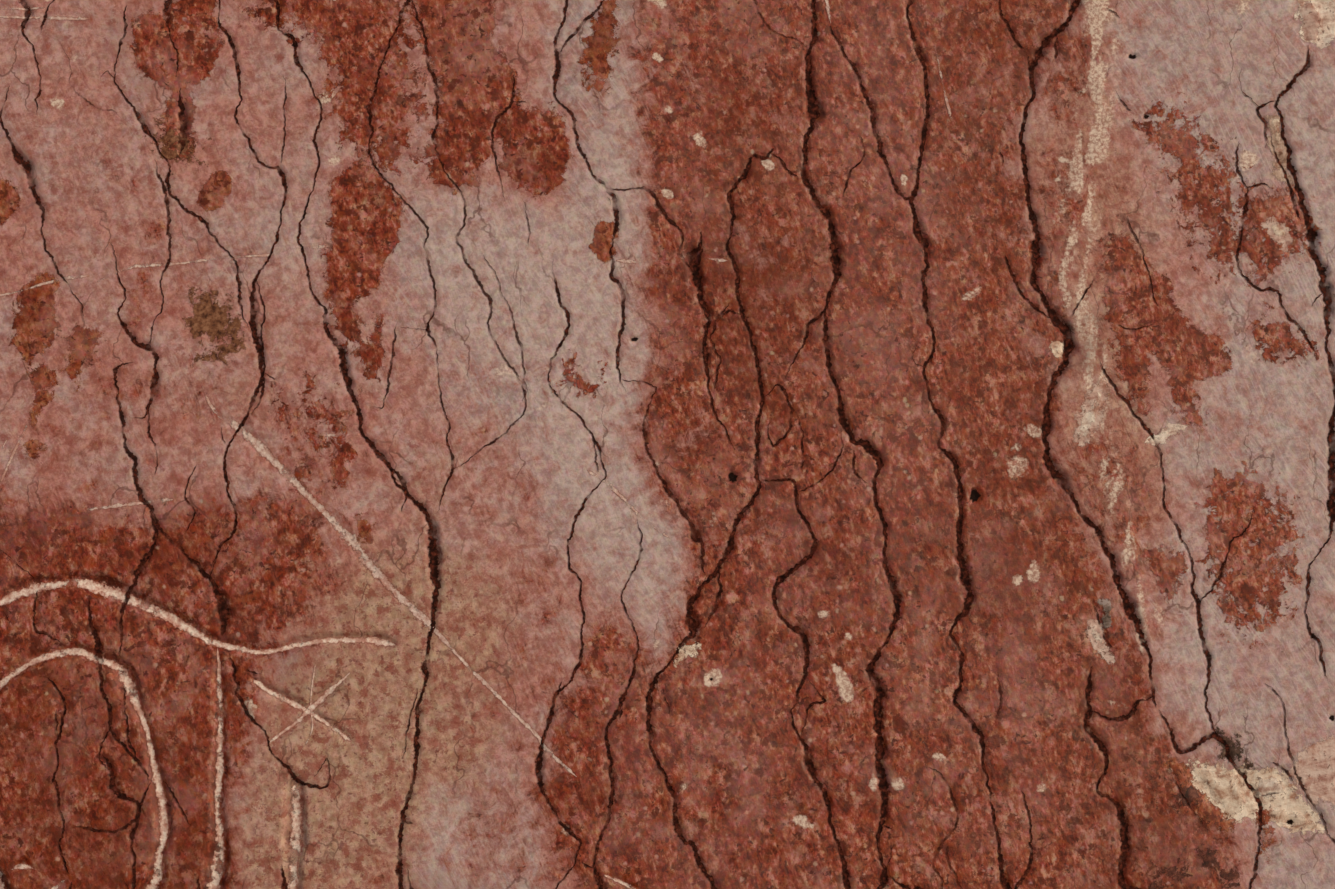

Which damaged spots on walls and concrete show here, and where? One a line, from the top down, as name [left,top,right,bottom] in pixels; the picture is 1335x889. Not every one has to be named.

crack [0,0,1033,889]
crack [999,0,1335,889]
spalling [1186,715,1335,837]
spalling [1294,0,1335,51]